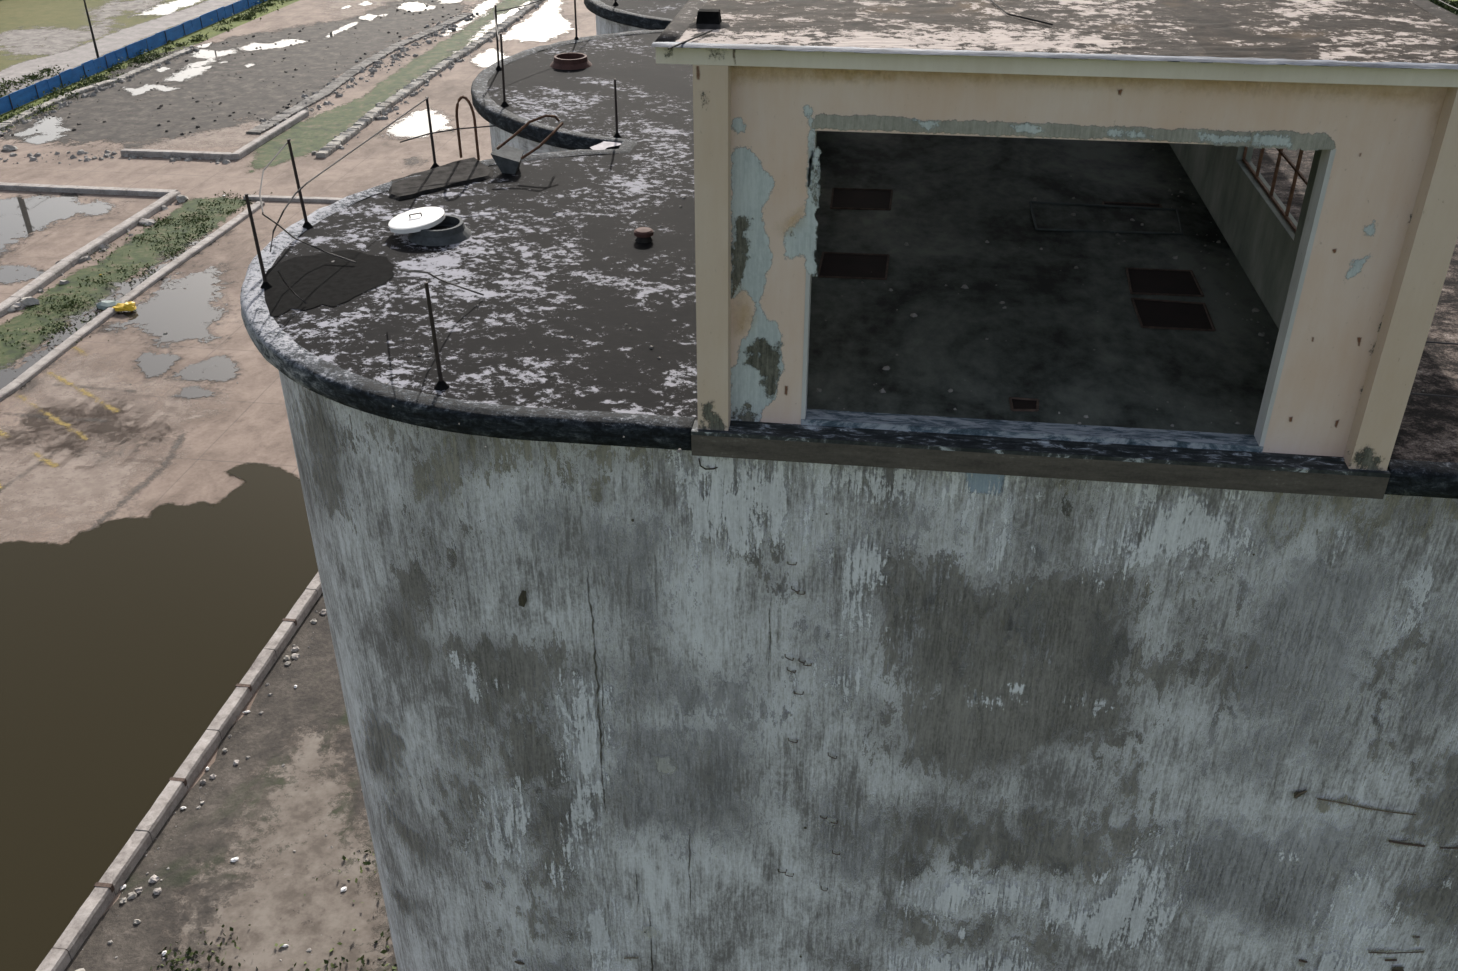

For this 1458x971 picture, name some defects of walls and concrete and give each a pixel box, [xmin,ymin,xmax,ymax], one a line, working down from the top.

peeling [731,105,1336,422]
crack [587,577,605,805]